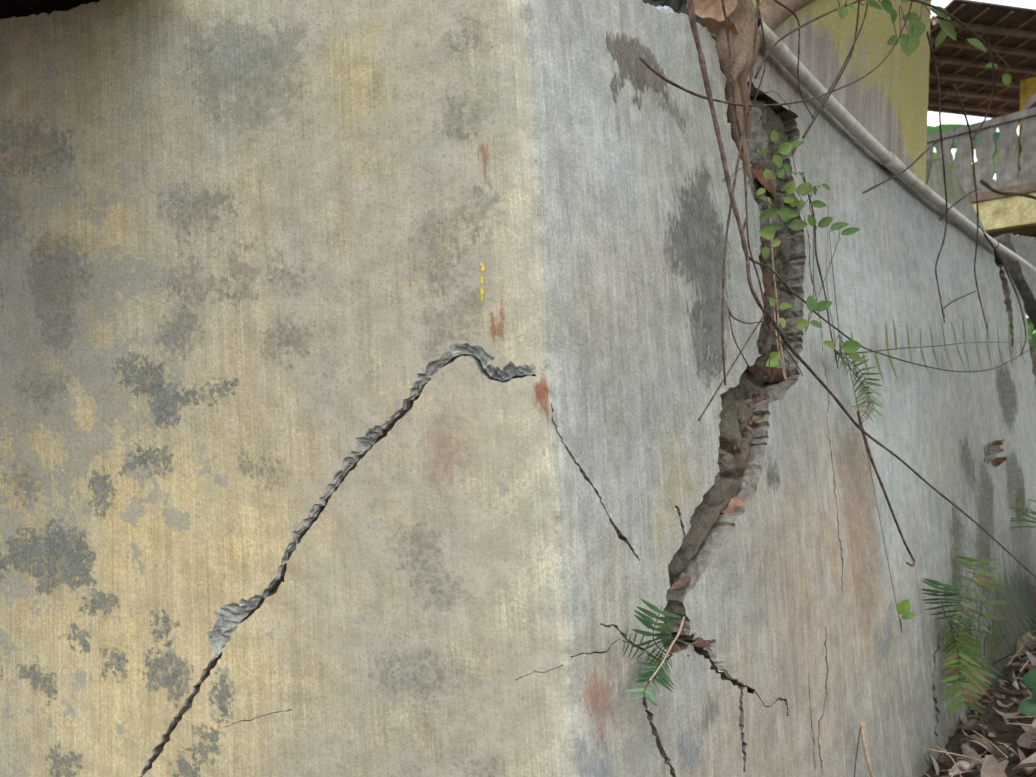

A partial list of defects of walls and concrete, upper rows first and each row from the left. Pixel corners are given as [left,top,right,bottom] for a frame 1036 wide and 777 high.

crack [138,343,640,777]
corrosion [535,377,549,421]
crack [516,74,843,777]
damp [664,153,732,395]